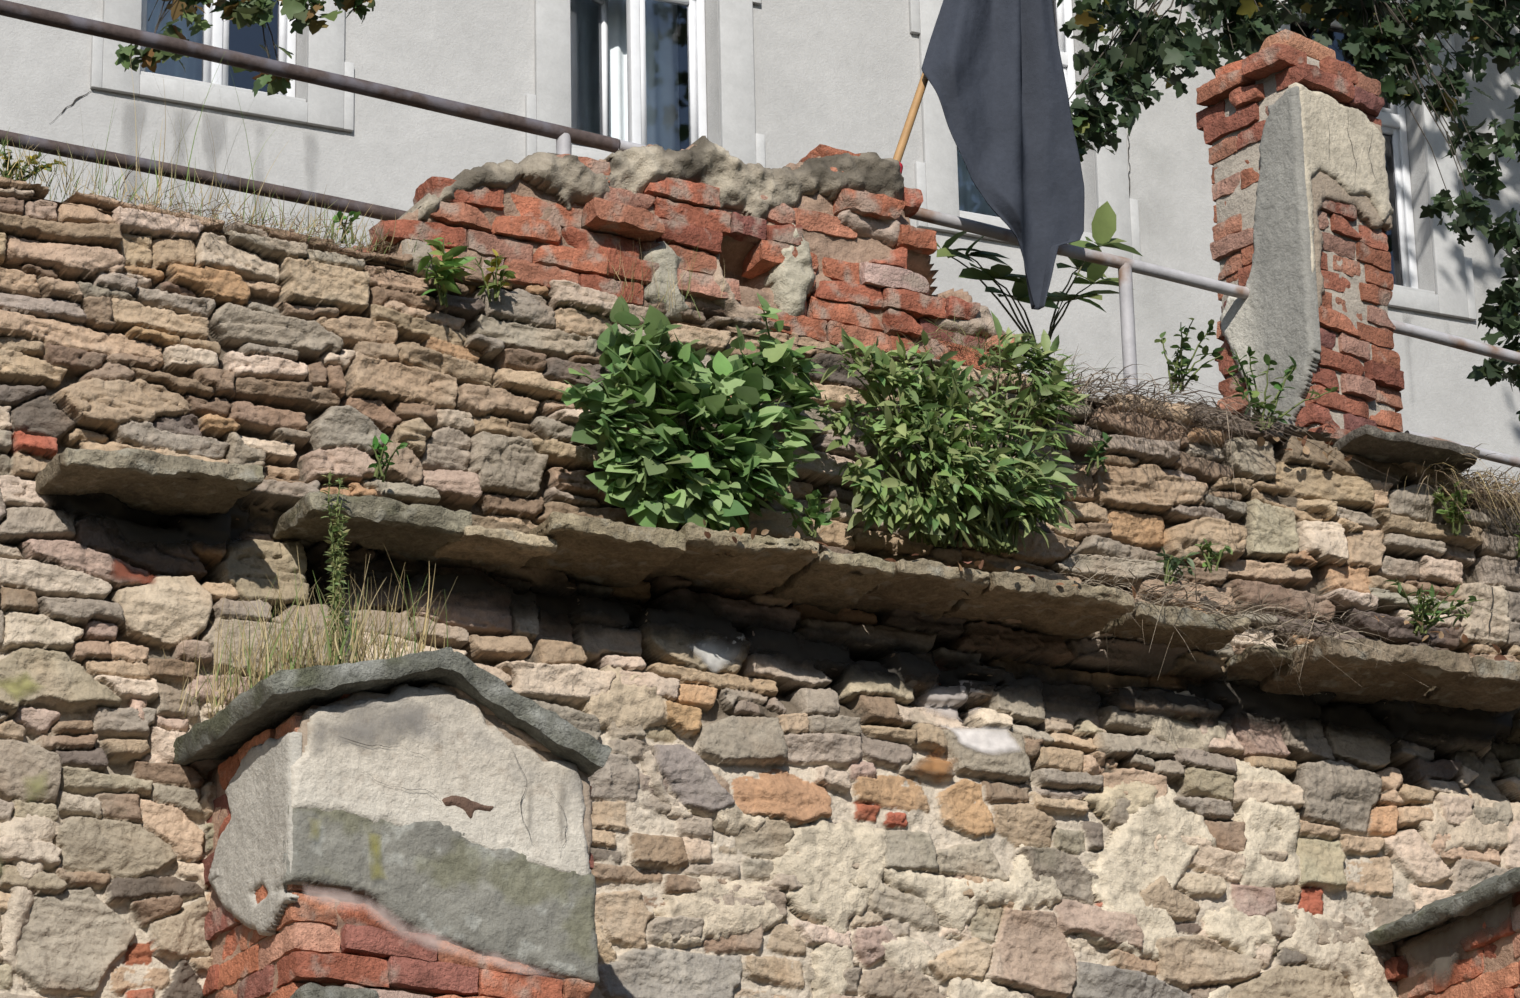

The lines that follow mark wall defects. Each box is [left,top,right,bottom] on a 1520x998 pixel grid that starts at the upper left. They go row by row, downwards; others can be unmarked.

peeling [1220,82,1394,425]
damp [319,893,442,946]
peeling [208,683,592,936]